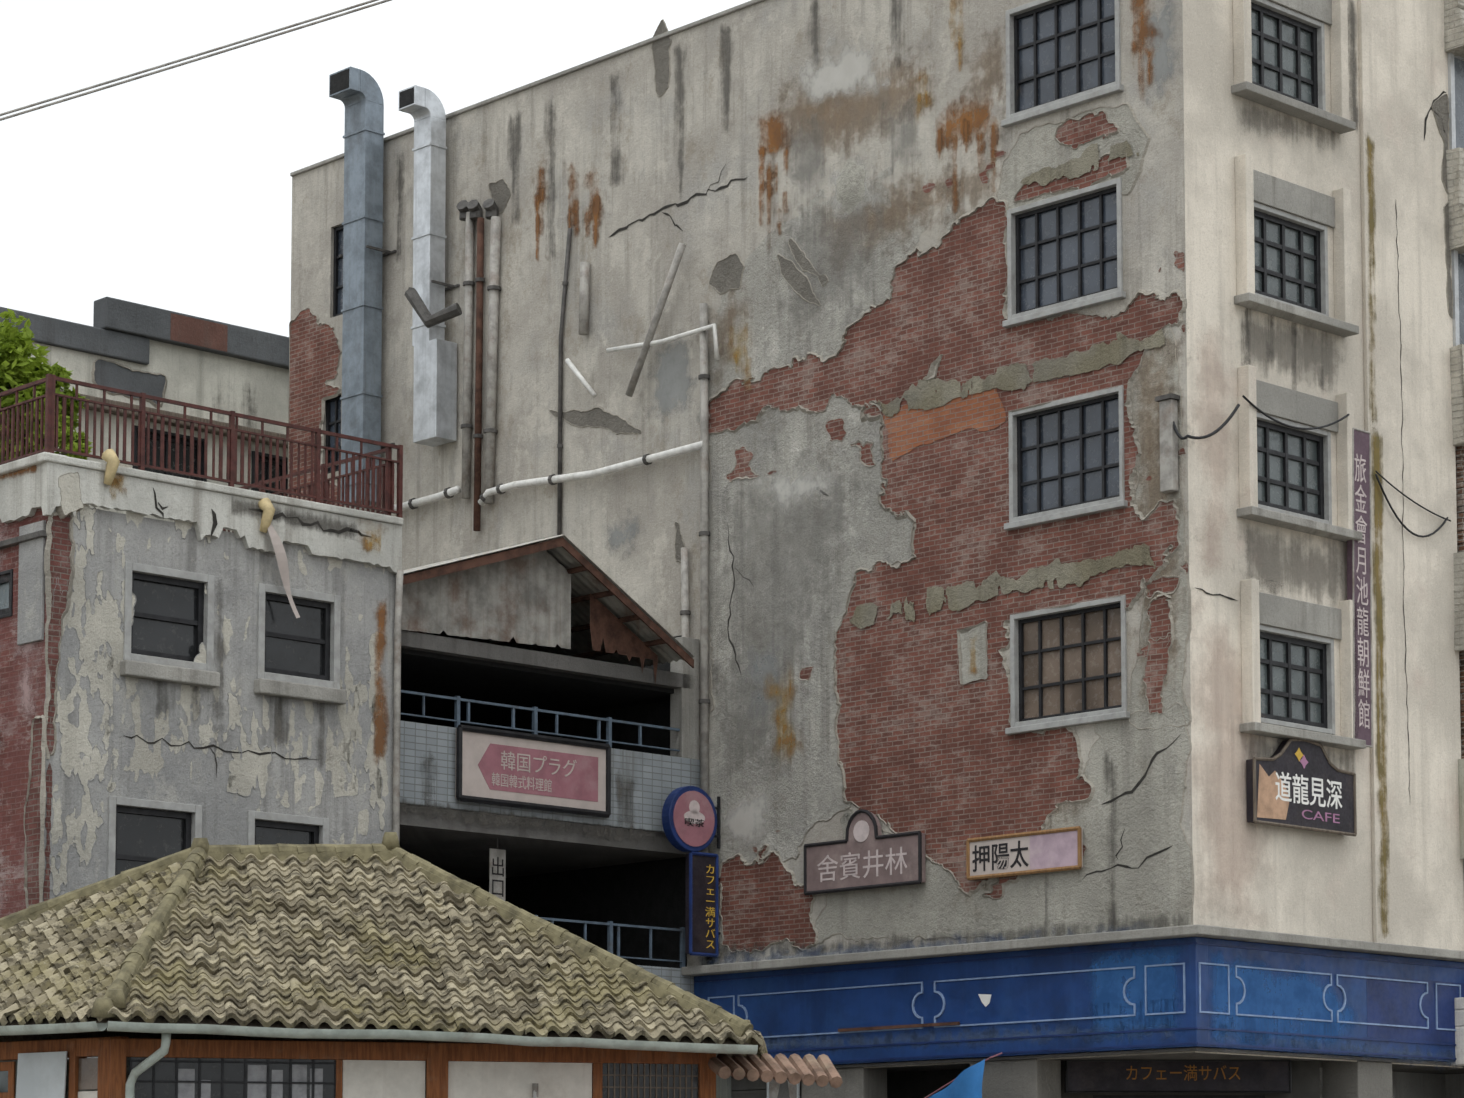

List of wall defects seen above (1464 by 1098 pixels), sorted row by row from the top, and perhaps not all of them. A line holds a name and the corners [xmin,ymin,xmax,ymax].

corrosion [534,168,545,260]
corrosion [568,165,602,246]
crack [609,164,746,237]
corrosion [758,62,929,234]
corrosion [936,42,1002,165]
flaking render [288,308,346,507]
crack [211,509,371,537]
flaking render [696,110,1194,958]
peeling [23,472,389,908]
crack [123,735,317,778]
corrosion [374,605,388,757]
crack [1083,734,1181,879]